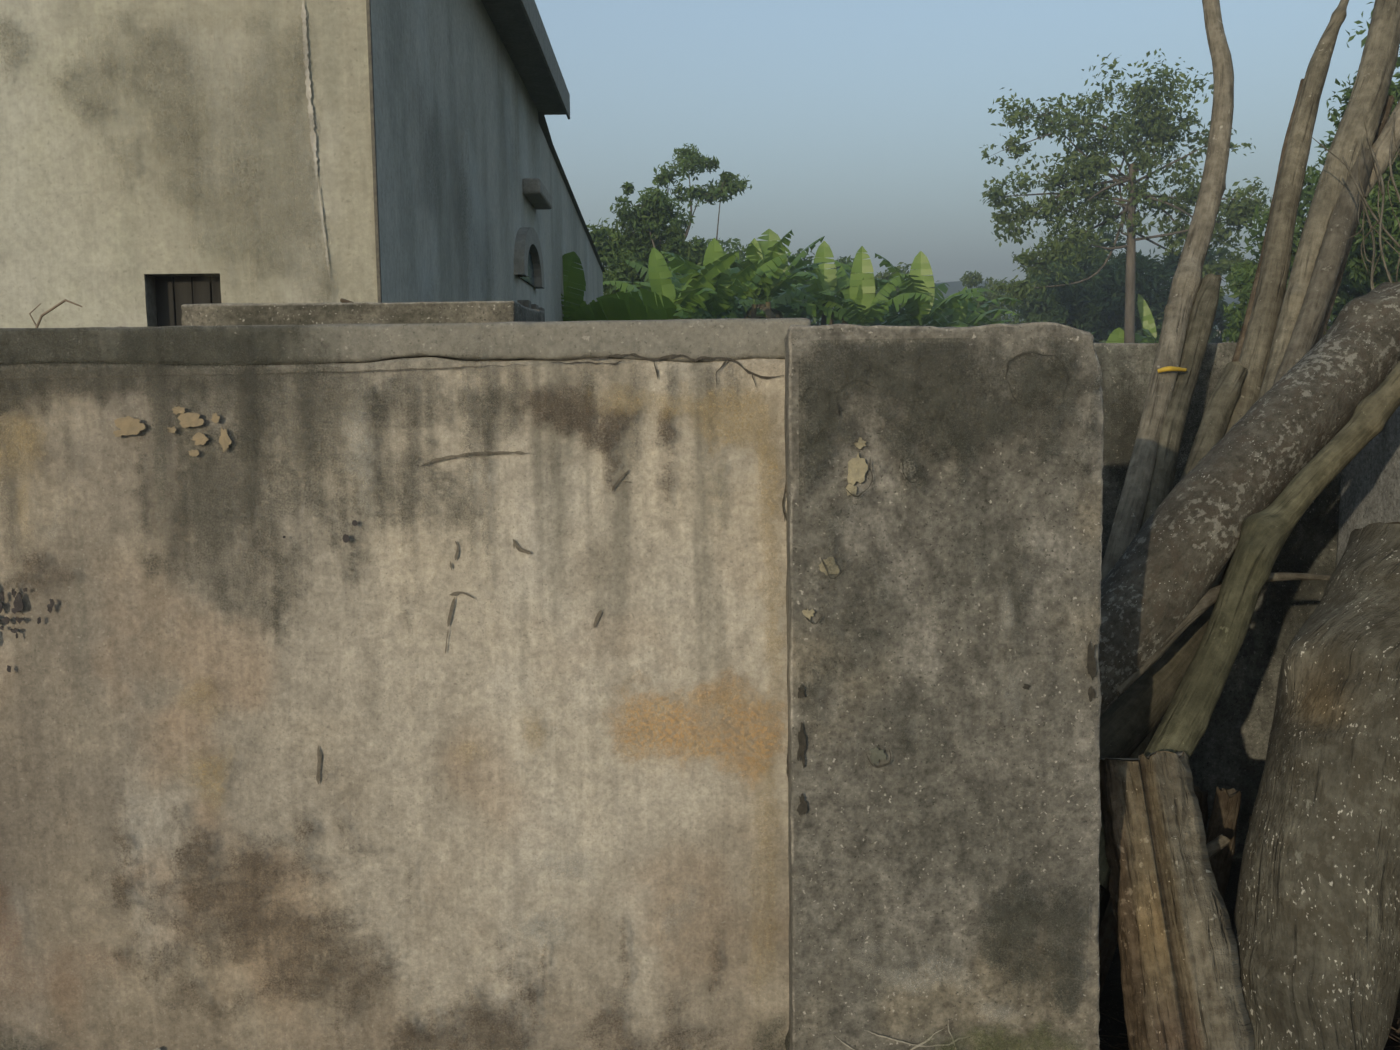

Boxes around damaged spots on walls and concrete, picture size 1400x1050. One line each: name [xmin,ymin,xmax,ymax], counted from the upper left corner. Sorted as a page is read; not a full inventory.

peeling [113,416,146,437]
peeling [167,406,232,457]
crack [0,353,877,427]
damp [460,372,640,507]
spalling [844,437,873,497]
damp [112,809,390,1025]
damp [390,946,546,1050]